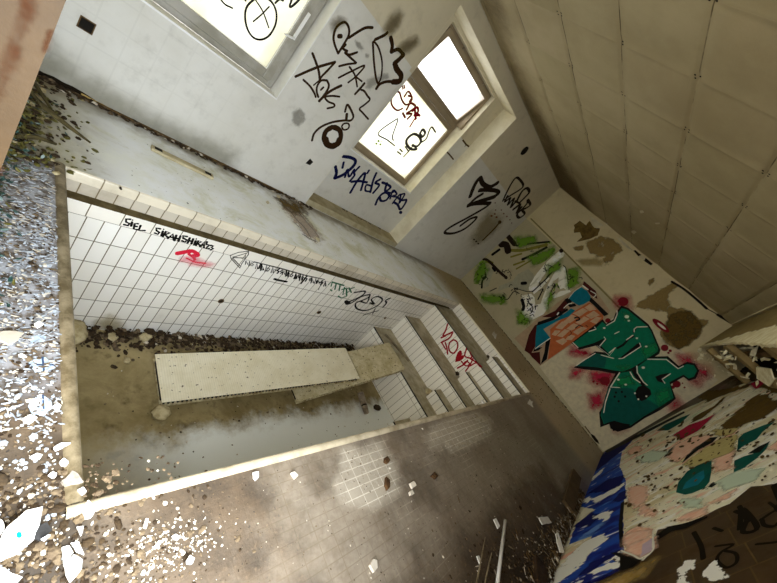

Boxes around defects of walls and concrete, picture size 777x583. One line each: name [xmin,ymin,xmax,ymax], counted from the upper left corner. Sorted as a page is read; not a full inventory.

peeling [574,216,653,265]